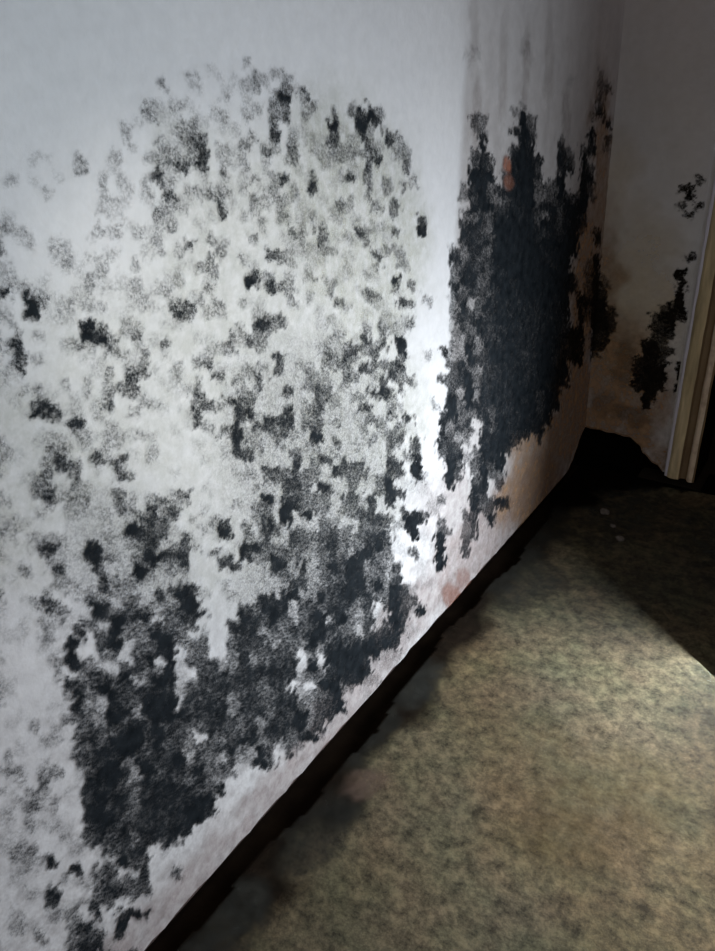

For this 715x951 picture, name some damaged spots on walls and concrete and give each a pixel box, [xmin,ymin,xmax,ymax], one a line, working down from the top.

leakage [149,120,228,233]
leakage [23,288,50,321]
leakage [169,235,226,322]
leakage [0,330,28,375]
flaking render [568,426,663,477]
leakage [178,62,715,951]
leakage [25,318,430,951]
leakage [11,843,60,872]